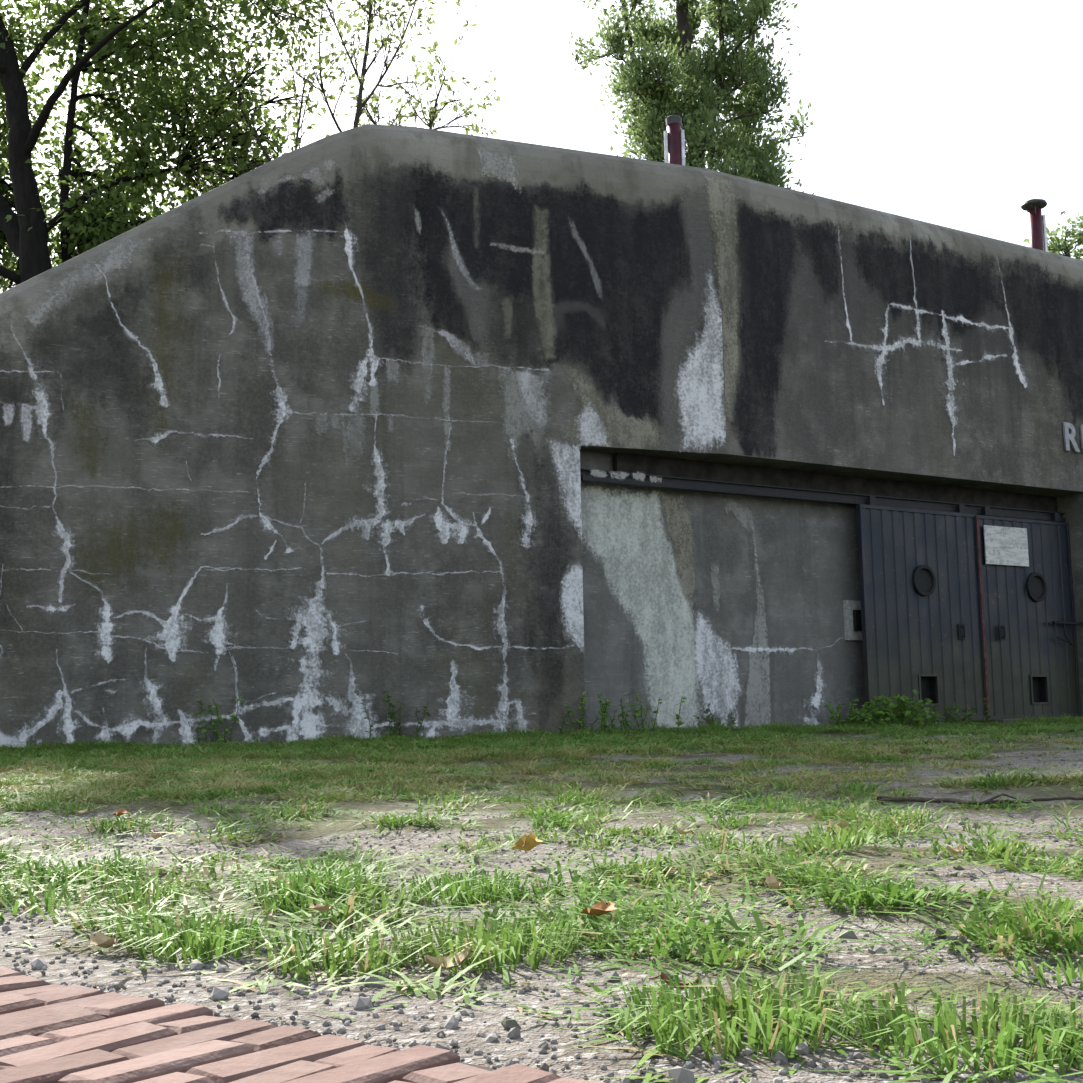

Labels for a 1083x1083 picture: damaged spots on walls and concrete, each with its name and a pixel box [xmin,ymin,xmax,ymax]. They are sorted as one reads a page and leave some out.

leakage [225,174,346,241]
efflorescence [4,405,42,441]
crack [98,268,176,444]
crack [202,289,293,559]
crack [344,229,380,412]
leakage [415,167,838,539]
crack [825,241,1027,455]
leakage [857,233,1083,424]
efflorescence [0,733,41,749]
crack [19,439,552,746]
efflorescence [694,528,770,728]
crack [726,647,824,725]